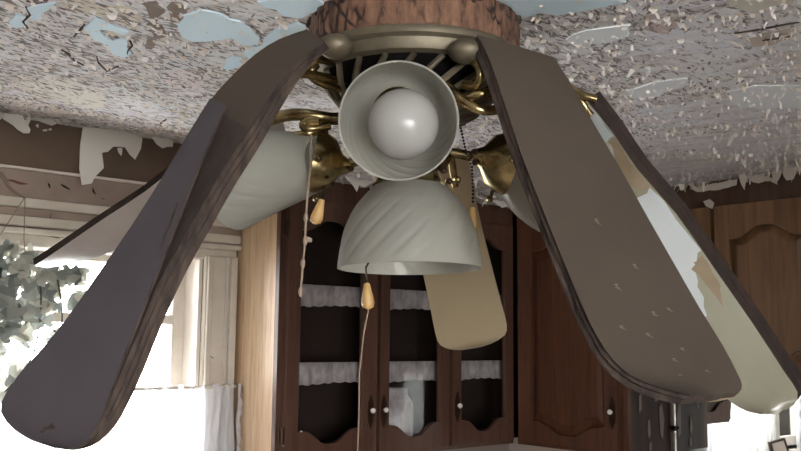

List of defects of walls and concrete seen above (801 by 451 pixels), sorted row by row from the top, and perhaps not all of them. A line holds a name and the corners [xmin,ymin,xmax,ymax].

crack [22,6,31,29]
crack [61,23,133,72]
crack [734,22,801,41]
peeling [0,0,324,199]
peeling [283,80,339,112]
peeling [456,104,503,151]
peeling [497,0,801,209]
peeling [470,166,509,209]